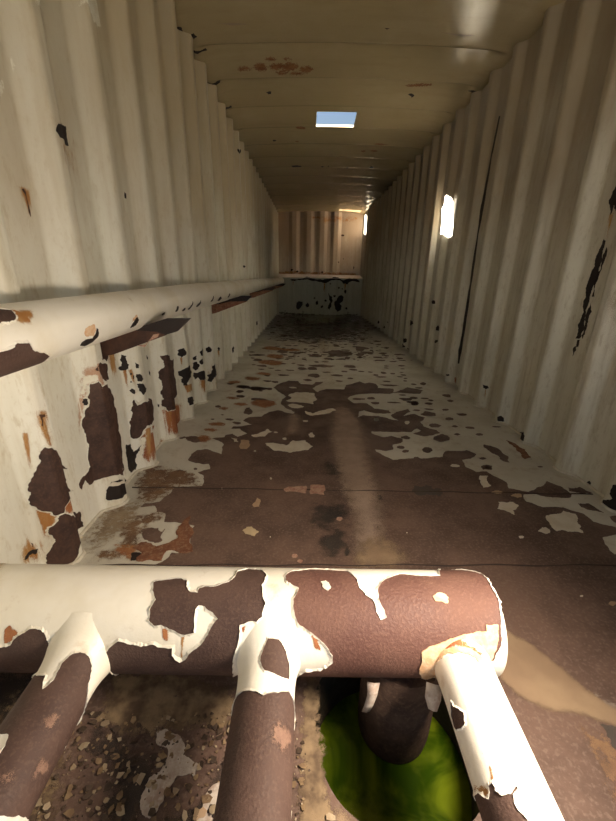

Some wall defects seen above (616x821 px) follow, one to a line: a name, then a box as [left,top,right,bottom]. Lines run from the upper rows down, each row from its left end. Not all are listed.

rust [237,56,315,76]
peeling [573,187,616,355]
peeling [290,277,360,312]
peeling [0,308,18,328]
peeling [80,324,99,346]
peeling [0,340,52,378]
peeling [0,346,616,821]